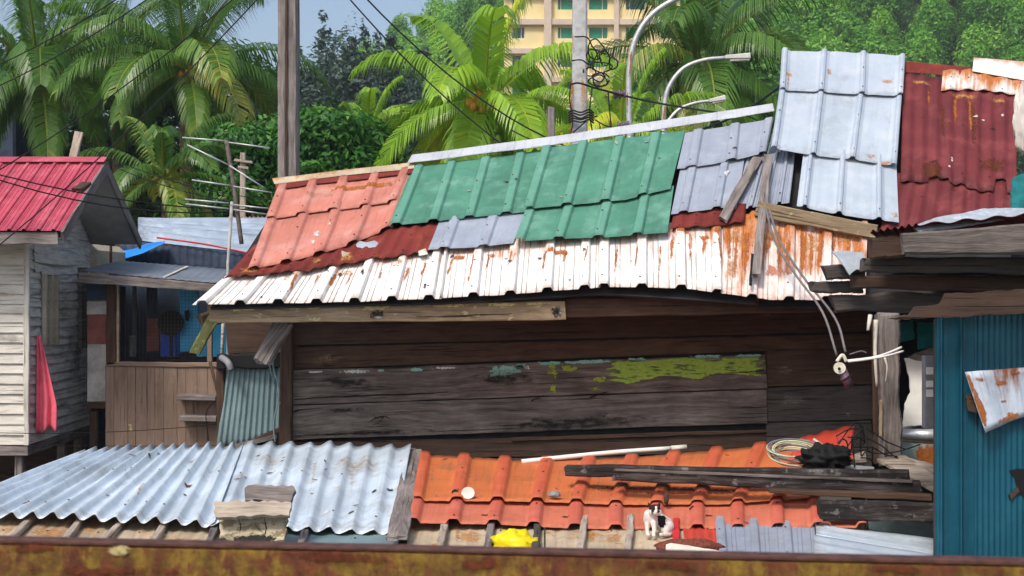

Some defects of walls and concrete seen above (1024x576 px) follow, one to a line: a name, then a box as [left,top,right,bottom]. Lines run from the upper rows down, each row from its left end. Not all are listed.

corrosion [941,94,976,143]
corrosion [334,182,392,190]
corrosion [314,254,353,285]
corrosion [542,246,568,269]
corrosion [659,226,749,277]
corrosion [764,230,852,279]
corrosion [965,375,1018,426]